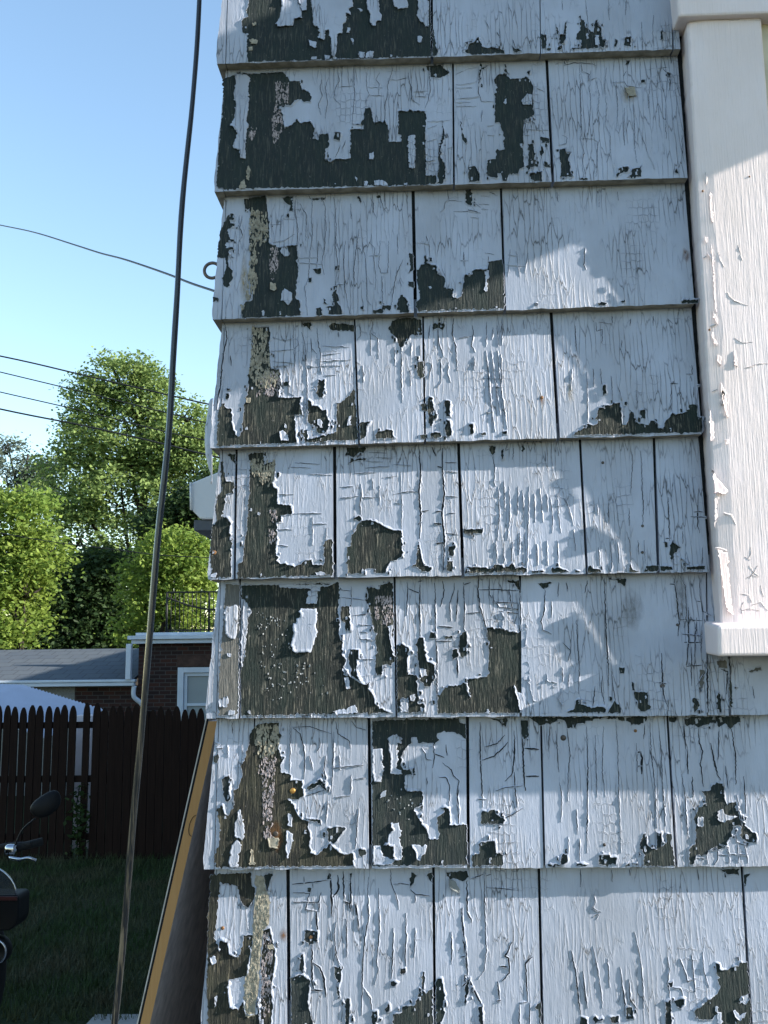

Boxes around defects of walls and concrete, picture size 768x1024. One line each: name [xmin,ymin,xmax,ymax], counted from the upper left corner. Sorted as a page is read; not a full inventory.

crack [524,0,708,207]
peeling [205,0,729,1024]
peeling [547,781,759,867]
crack [570,932,710,1017]
peeling [663,956,752,1024]